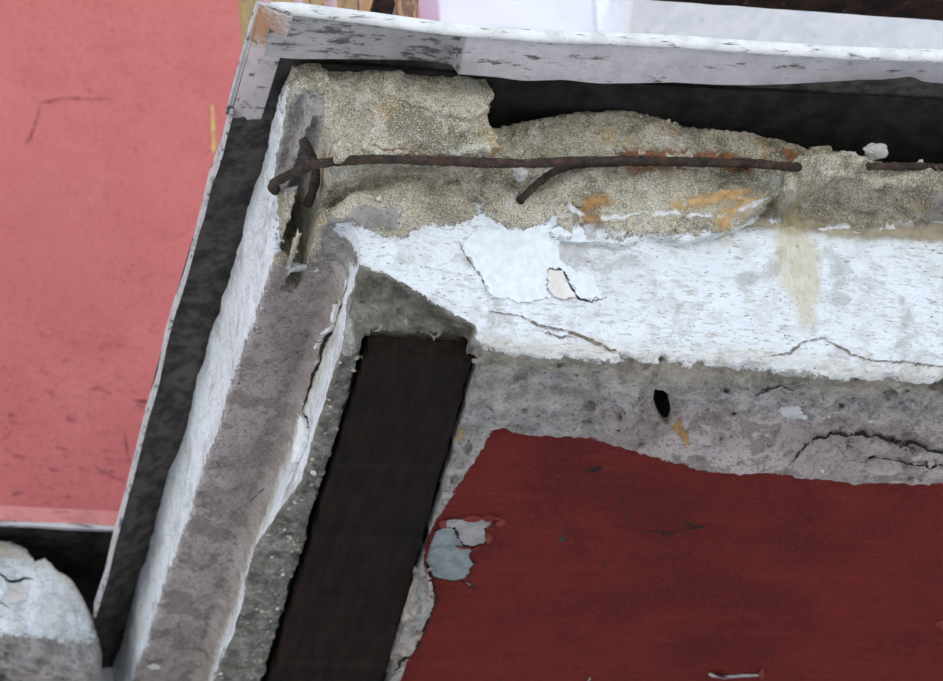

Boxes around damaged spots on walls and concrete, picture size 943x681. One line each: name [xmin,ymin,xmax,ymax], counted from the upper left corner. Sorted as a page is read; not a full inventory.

rust [621,148,751,174]
leakage [568,202,712,225]
rust [673,188,757,229]
leakage [718,217,943,240]
crack [459,242,631,359]
crack [230,284,347,428]
spalling [214,63,943,681]
crack [755,385,793,396]
crack [743,337,943,367]
crack [787,430,943,470]